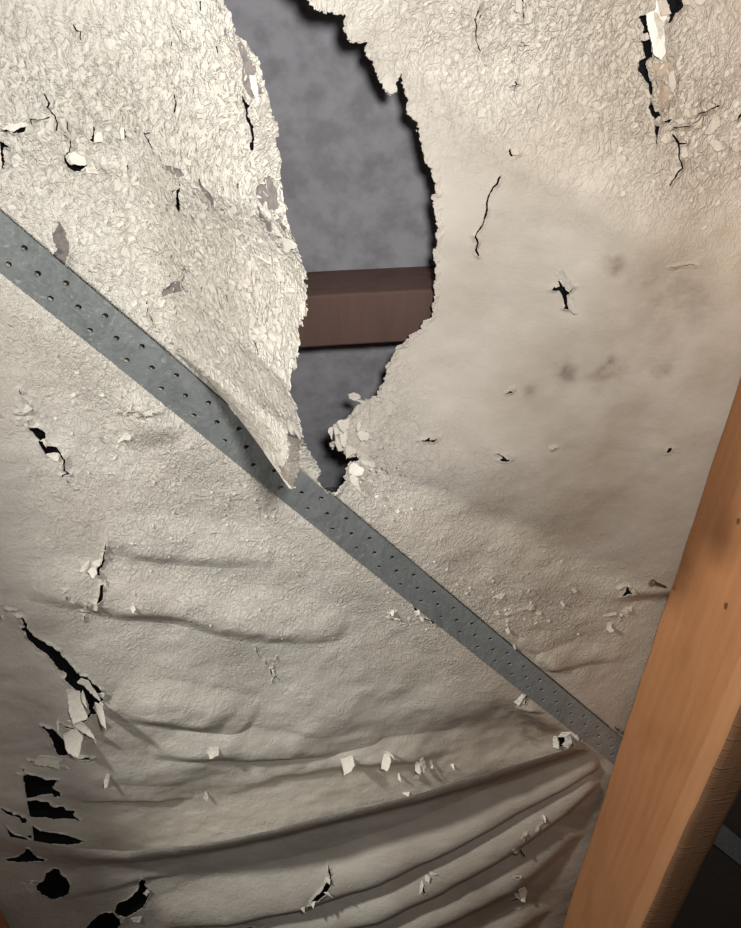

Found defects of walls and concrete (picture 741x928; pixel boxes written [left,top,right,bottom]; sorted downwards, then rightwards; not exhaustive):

peeling [347,25,373,42]
peeling [383,78,397,94]
crack [632,0,705,191]
peeling [0,0,302,468]
crack [470,170,506,260]
peeling [110,390,214,516]
peeling [328,419,402,498]
peeling [56,678,106,758]
peeling [205,747,219,759]
peeling [509,887,527,910]